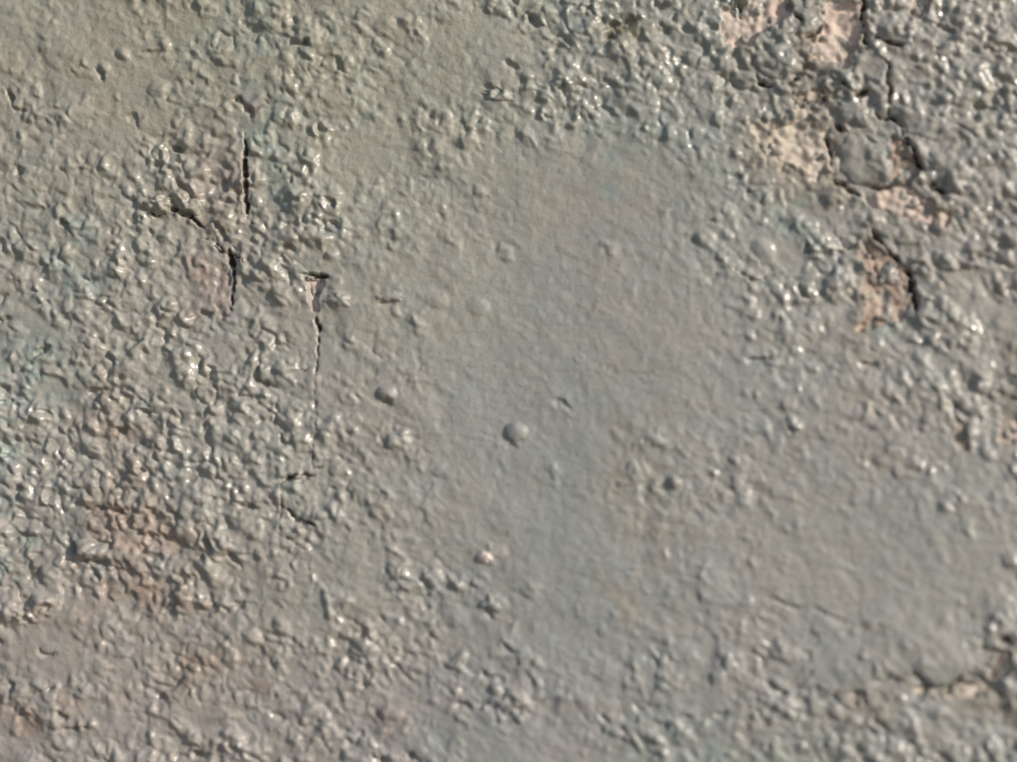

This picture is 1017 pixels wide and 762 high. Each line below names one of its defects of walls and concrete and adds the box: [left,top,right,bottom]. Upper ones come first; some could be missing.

spalling [719,0,982,228]
crack [860,0,973,196]
crack [243,133,256,225]
crack [308,272,328,280]
spalling [856,243,911,332]
crack [870,231,918,316]